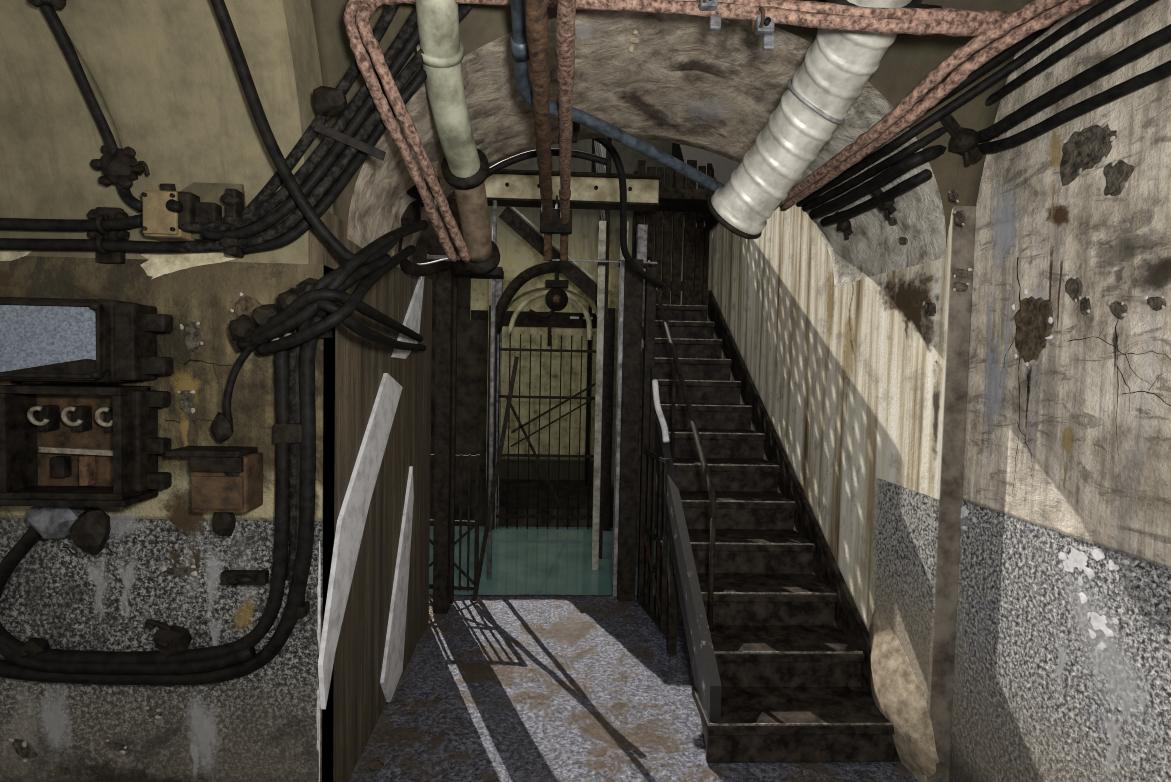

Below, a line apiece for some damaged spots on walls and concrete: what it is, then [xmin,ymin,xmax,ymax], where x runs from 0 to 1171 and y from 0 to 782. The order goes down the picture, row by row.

spalling [1060,122,1135,200]
spalling [1063,275,1091,316]
spalling [1107,301,1128,320]
spalling [1011,289,1054,424]